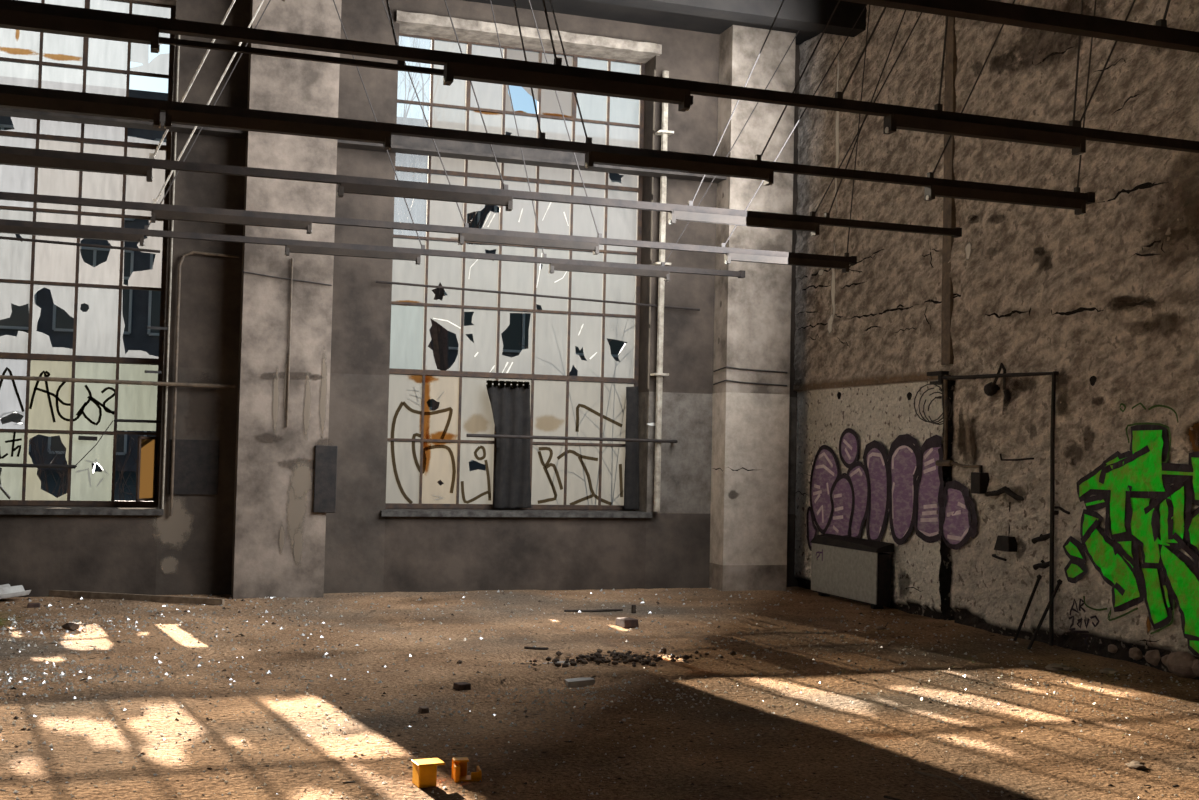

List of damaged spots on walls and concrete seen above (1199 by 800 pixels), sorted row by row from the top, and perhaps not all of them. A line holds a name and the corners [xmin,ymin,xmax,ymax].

crack [1097,182,1168,203]
crack [795,249,961,346]
crack [985,307,1103,318]
damp [1110,296,1154,311]